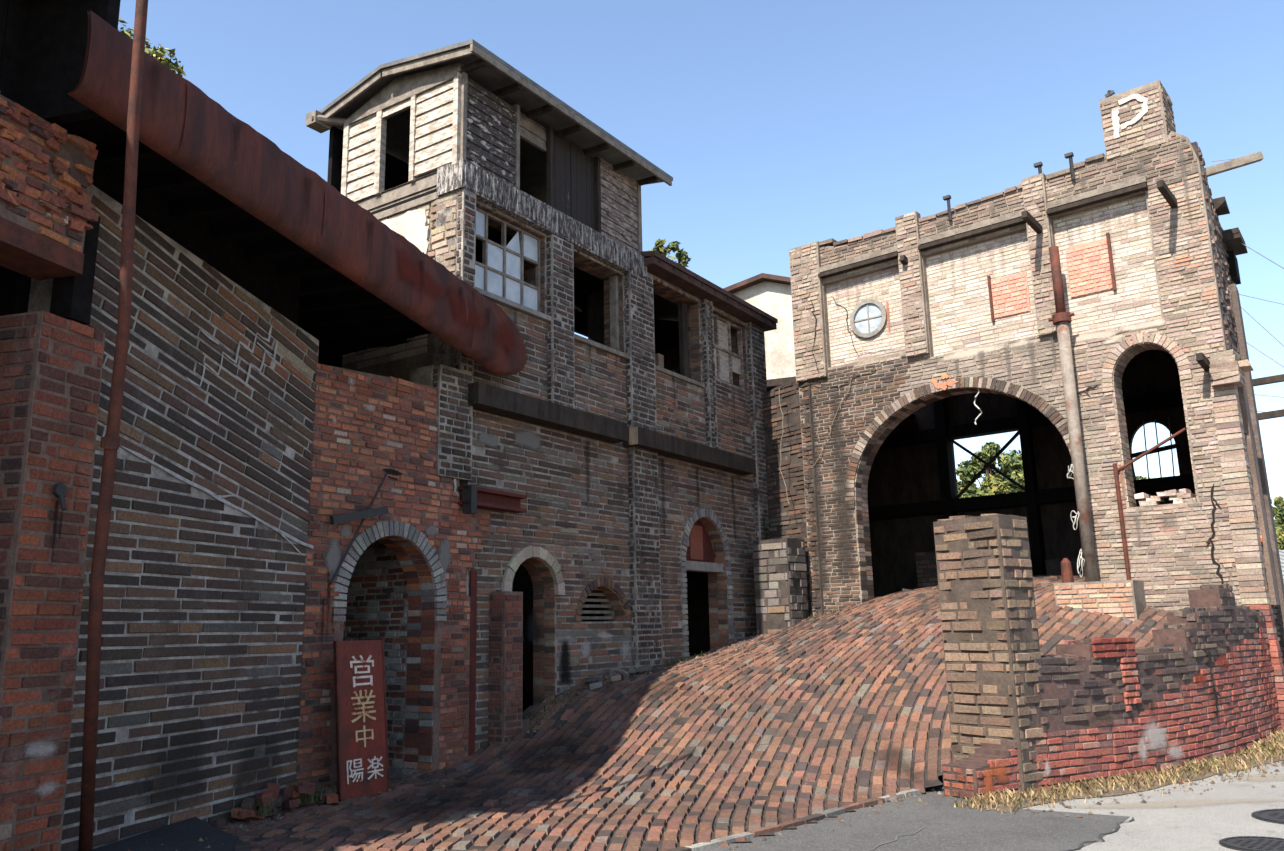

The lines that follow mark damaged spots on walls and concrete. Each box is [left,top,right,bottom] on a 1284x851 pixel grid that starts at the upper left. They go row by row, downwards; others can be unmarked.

crack [1205,484,1223,584]
damp [1140,728,1180,757]